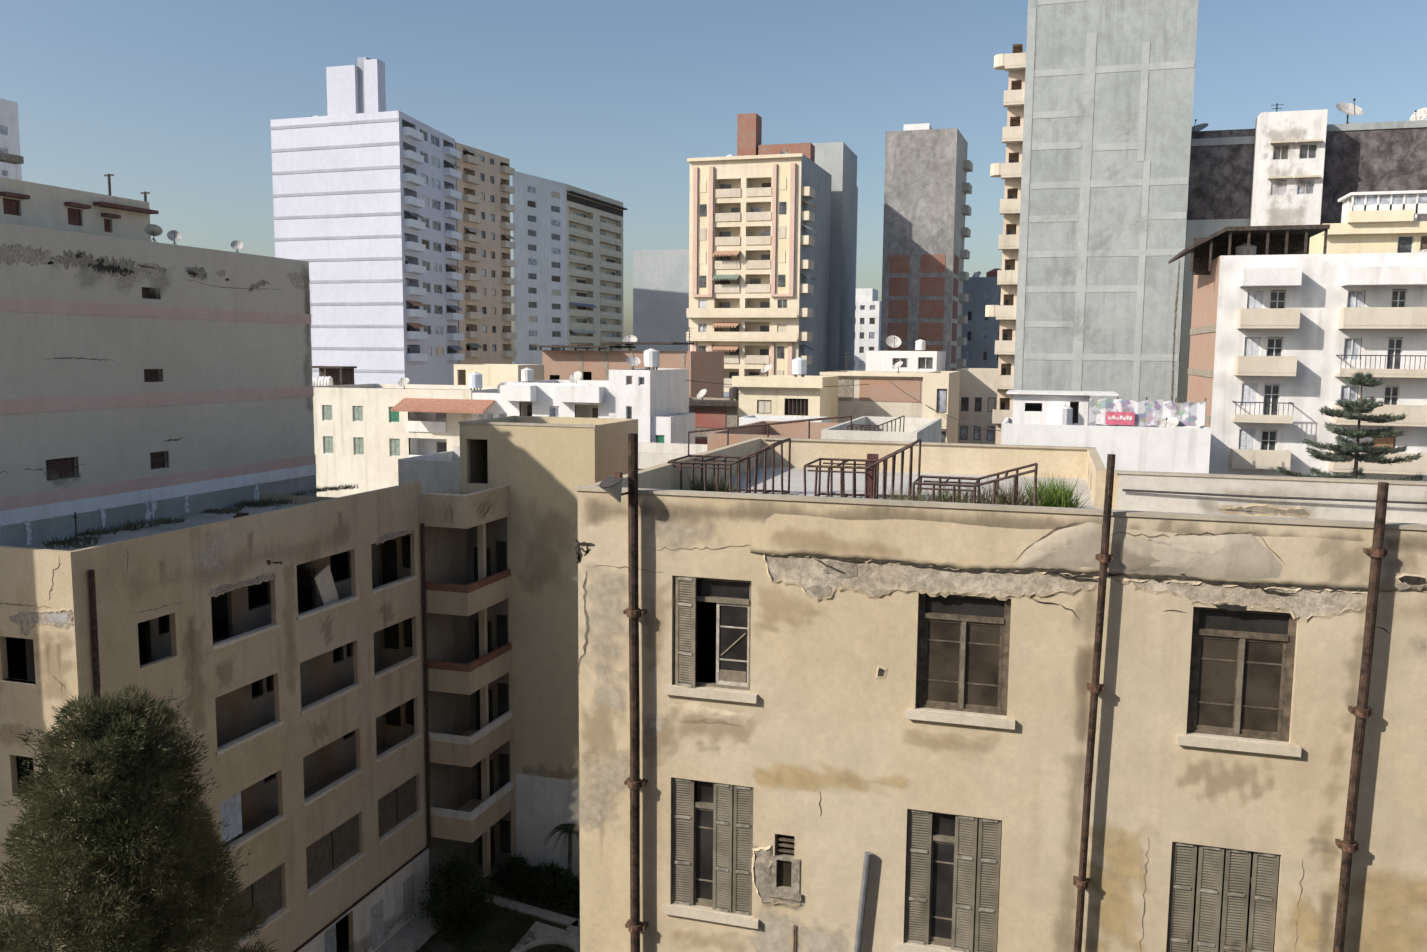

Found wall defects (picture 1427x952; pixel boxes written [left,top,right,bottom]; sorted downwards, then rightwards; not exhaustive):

spalling [0,243,229,281]
spalling [287,271,310,291]
flaking render [750,500,1427,623]
crack [578,522,1425,674]
spalling [9,608,74,636]